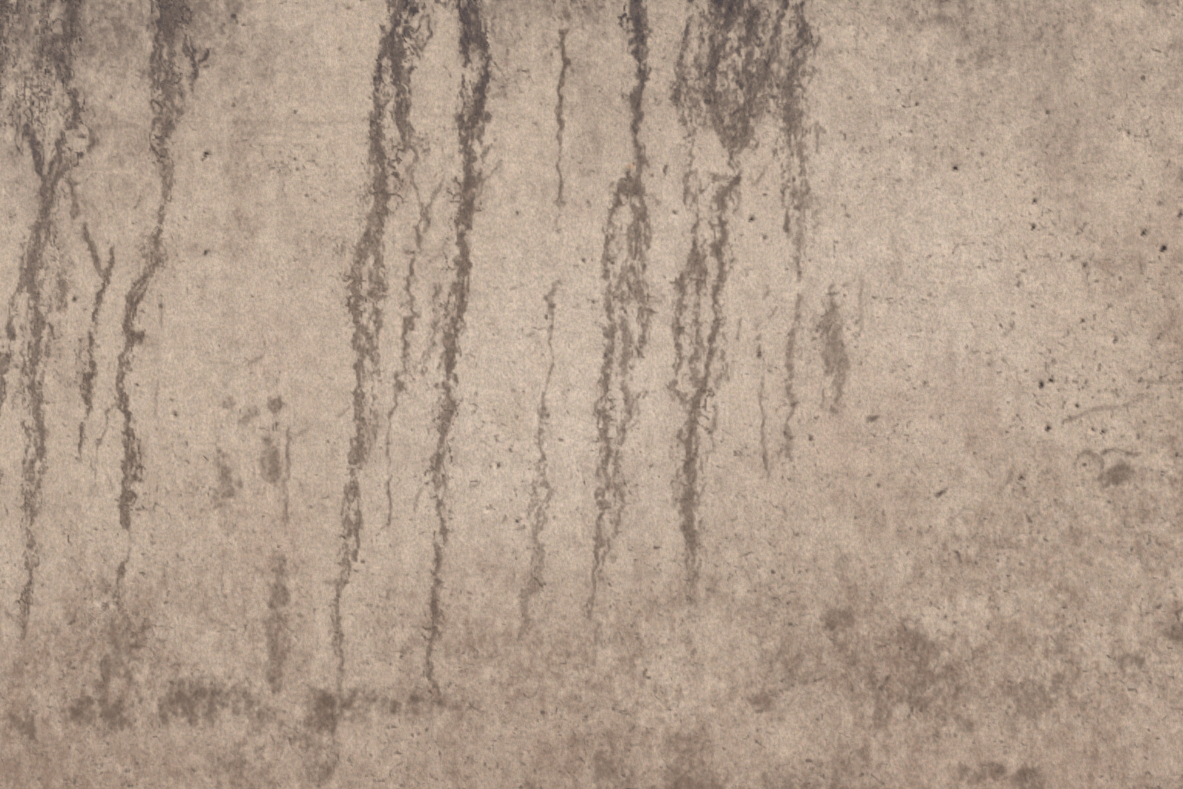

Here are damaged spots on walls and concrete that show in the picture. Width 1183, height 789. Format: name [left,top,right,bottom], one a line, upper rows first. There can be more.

water stain [0,0,88,548]
water stain [78,226,114,451]
water stain [116,226,162,527]
water stain [147,0,209,189]
water stain [344,0,496,704]
water stain [557,29,571,139]
water stain [595,0,654,567]
water stain [671,0,819,561]